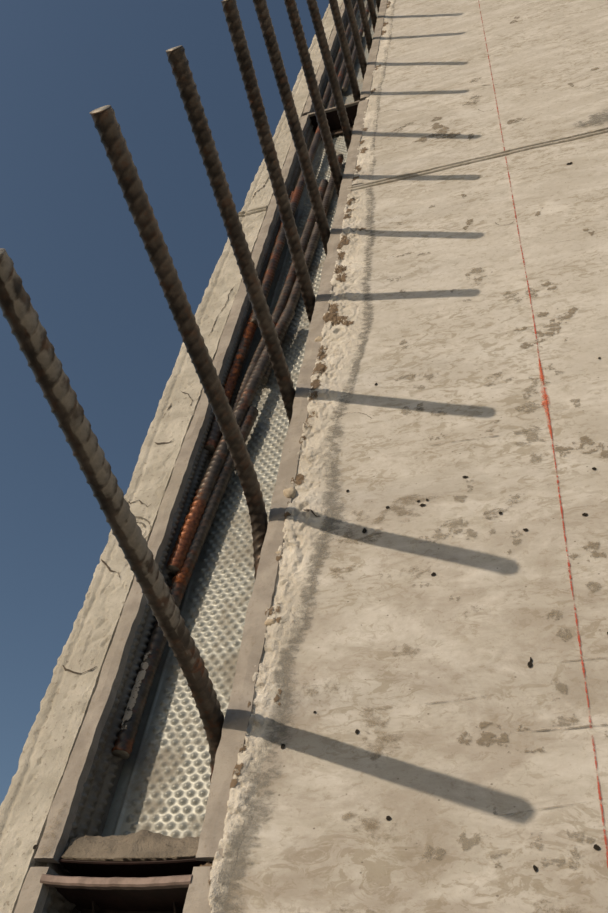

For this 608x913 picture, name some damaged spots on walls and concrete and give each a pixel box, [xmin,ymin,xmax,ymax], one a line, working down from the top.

damp [335,187,375,415]
spalling [0,0,395,913]
damp [265,464,342,745]
damp [215,756,278,913]